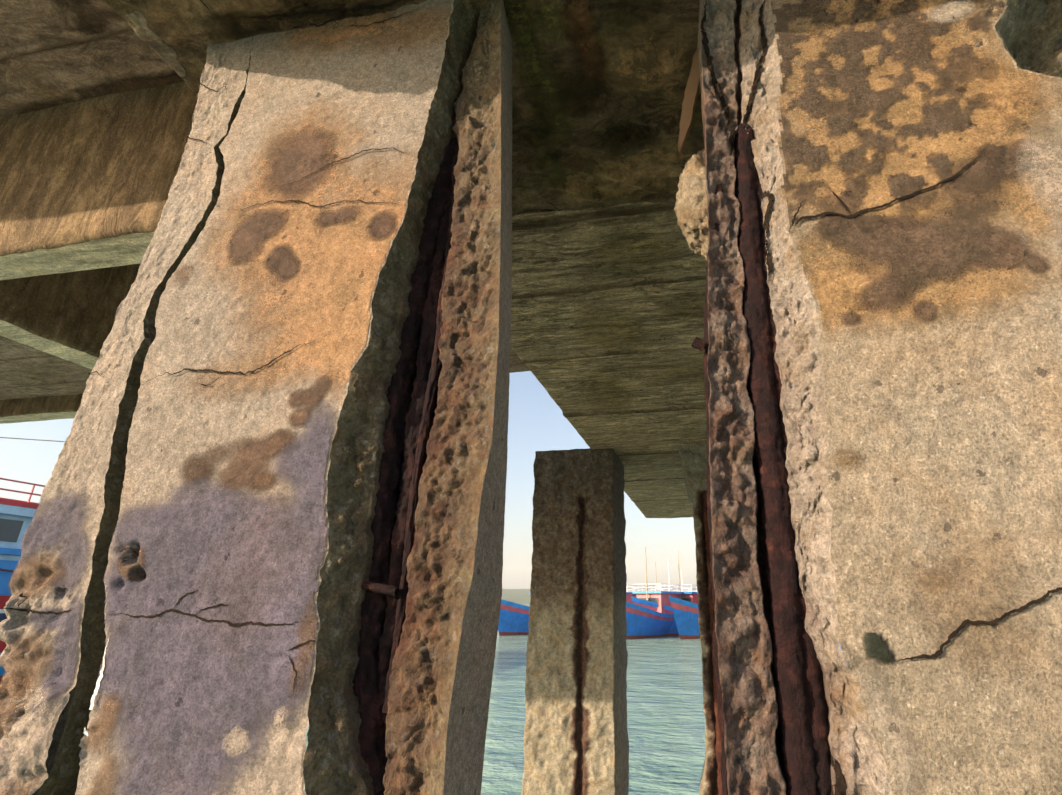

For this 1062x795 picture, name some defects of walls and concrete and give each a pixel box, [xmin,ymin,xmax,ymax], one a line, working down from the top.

crack [1,0,420,795]
damp [89,116,406,795]
spalling [303,0,501,795]
crack [700,0,767,163]
spalling [697,0,894,795]
crack [761,140,992,275]
damp [771,0,1062,327]
crack [892,587,1062,662]